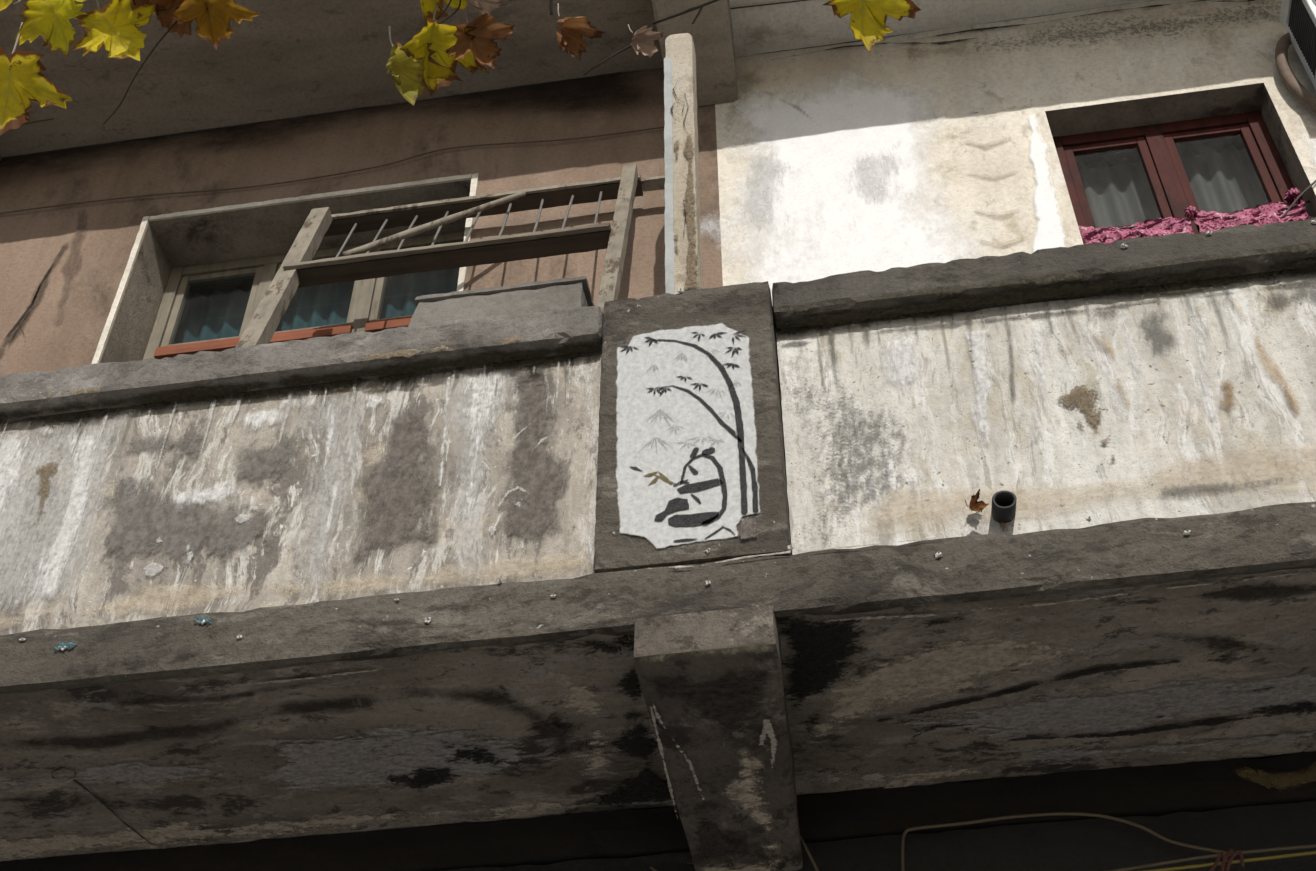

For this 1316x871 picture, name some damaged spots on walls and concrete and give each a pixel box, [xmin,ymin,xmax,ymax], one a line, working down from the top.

crack [5,246,64,345]
leakage [106,439,300,560]
leakage [245,399,334,468]
leakage [354,367,567,562]
leakage [1165,573,1316,602]
leakage [776,608,1072,737]
crack [52,767,152,845]
leakage [2,721,234,750]
leakage [0,813,396,860]
leakage [381,741,505,790]
leakage [421,634,779,871]
leakage [825,766,978,788]